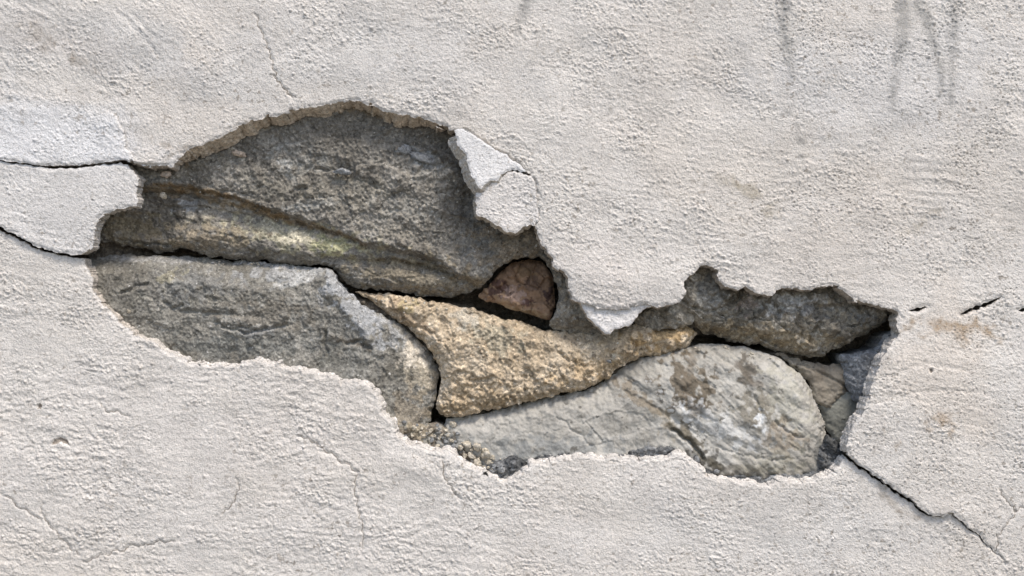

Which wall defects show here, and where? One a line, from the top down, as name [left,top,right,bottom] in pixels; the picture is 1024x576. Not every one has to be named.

crack [0,160,132,169]
crack [0,227,87,258]
crack [960,298,1024,315]
spalling [0,100,1003,559]
crack [842,452,1024,550]